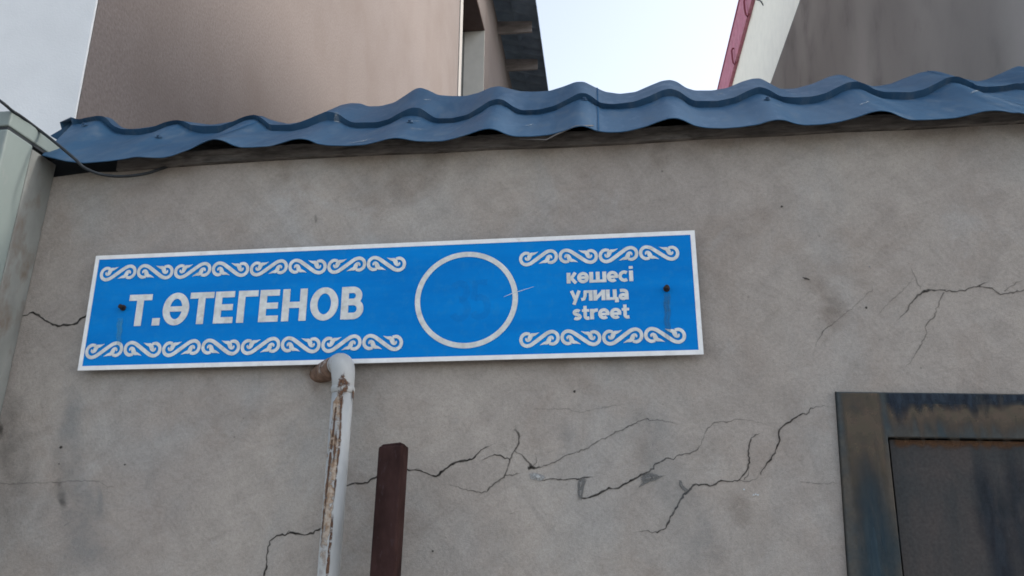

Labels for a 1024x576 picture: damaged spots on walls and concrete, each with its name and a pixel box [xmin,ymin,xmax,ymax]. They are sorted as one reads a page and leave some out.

crack [23,311,87,327]
crack [909,283,1024,339]
corrosion [320,374,354,576]
crack [407,431,699,499]
crack [648,408,814,533]
crack [263,528,321,576]